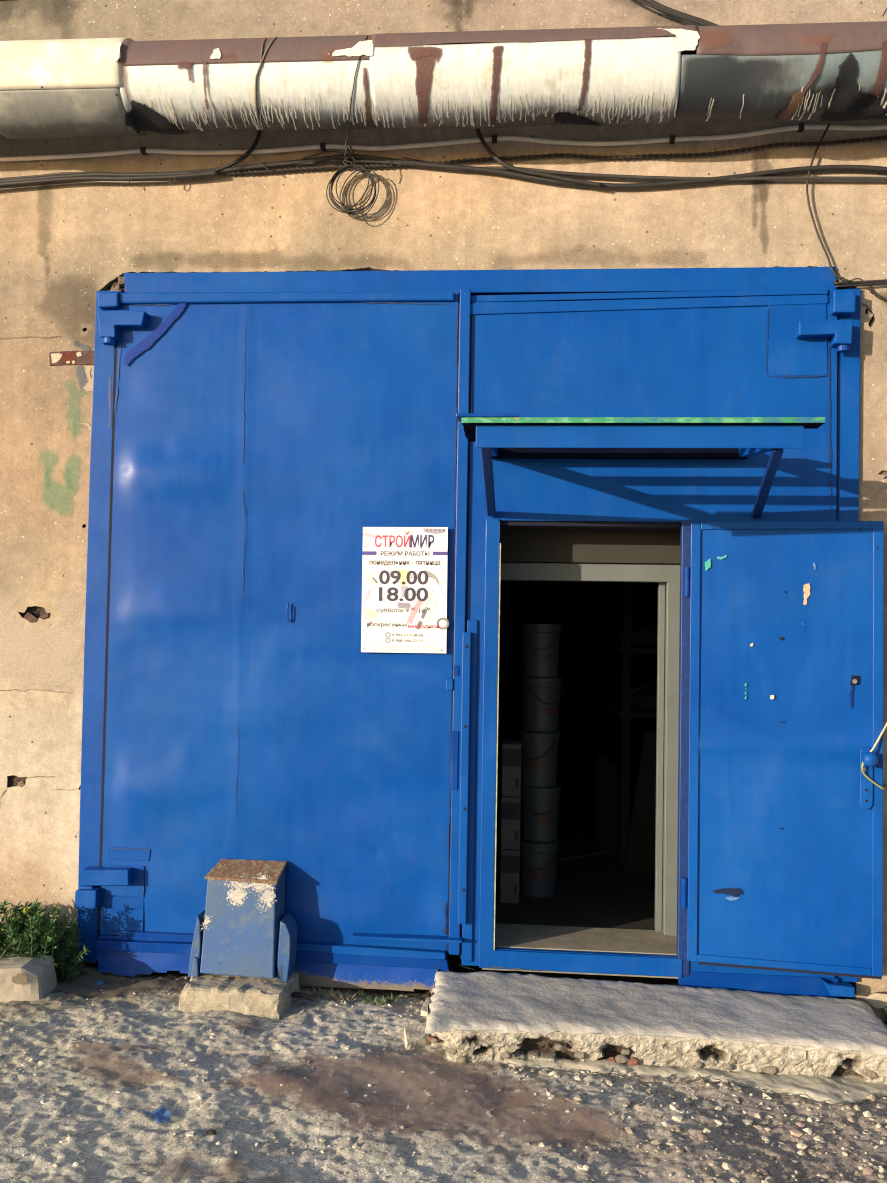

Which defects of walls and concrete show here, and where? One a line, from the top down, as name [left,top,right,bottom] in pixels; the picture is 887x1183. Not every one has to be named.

corrosion [177,61,209,110]
peeling [332,40,373,57]
corrosion [408,46,442,124]
corrosion [774,42,827,120]
corrosion [869,41,887,97]
spalling [17,606,51,623]
spalling [404,993,887,1085]